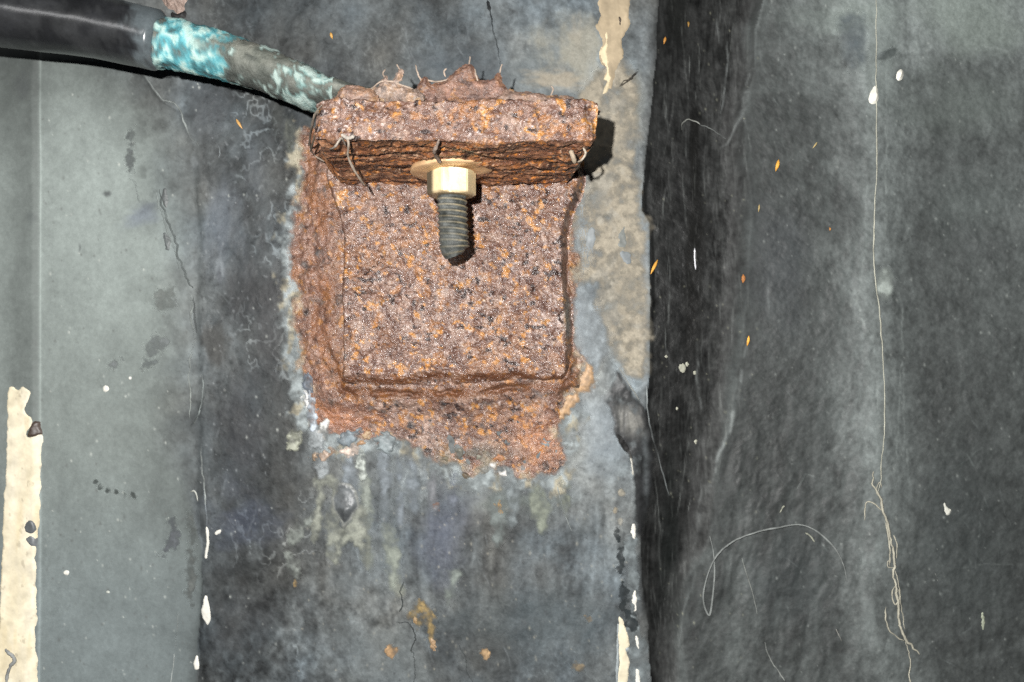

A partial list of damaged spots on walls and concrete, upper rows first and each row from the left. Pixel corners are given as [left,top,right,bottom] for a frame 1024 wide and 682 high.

peeling [596,0,630,94]
rust [273,128,378,461]
rust [558,364,594,454]
peeling [0,386,43,682]
damp [315,448,329,479]
damp [384,533,402,594]
damp [343,452,458,525]
damp [446,570,461,597]
rust [437,448,571,497]
damp [491,477,549,544]